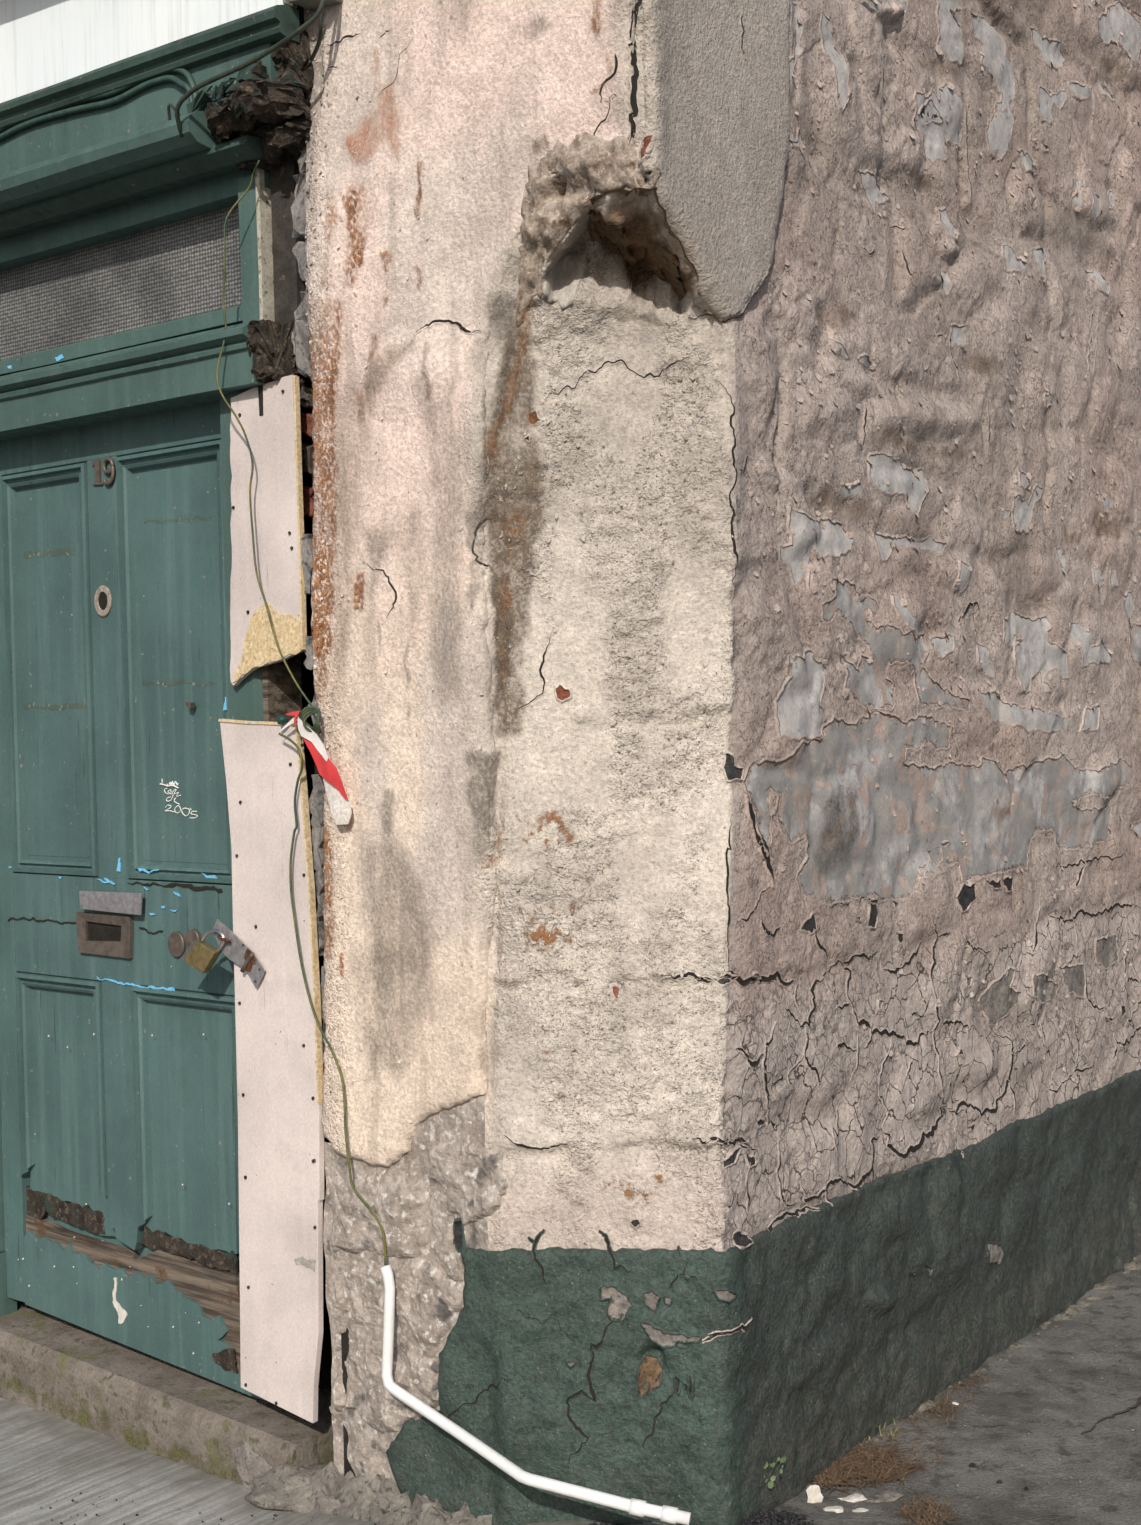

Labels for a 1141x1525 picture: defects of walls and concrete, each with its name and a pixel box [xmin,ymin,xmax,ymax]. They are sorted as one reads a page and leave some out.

crack [592,0,644,144]
corrosion [490,288,531,455]
spalling [300,7,382,1121]
peeling [486,0,1141,1250]
crack [660,794,1141,1233]
spalling [318,1167,332,1392]
spalling [453,1217,466,1253]
spalling [599,1283,704,1402]
spalling [713,1285,738,1304]
crack [1081,1396,1141,1435]